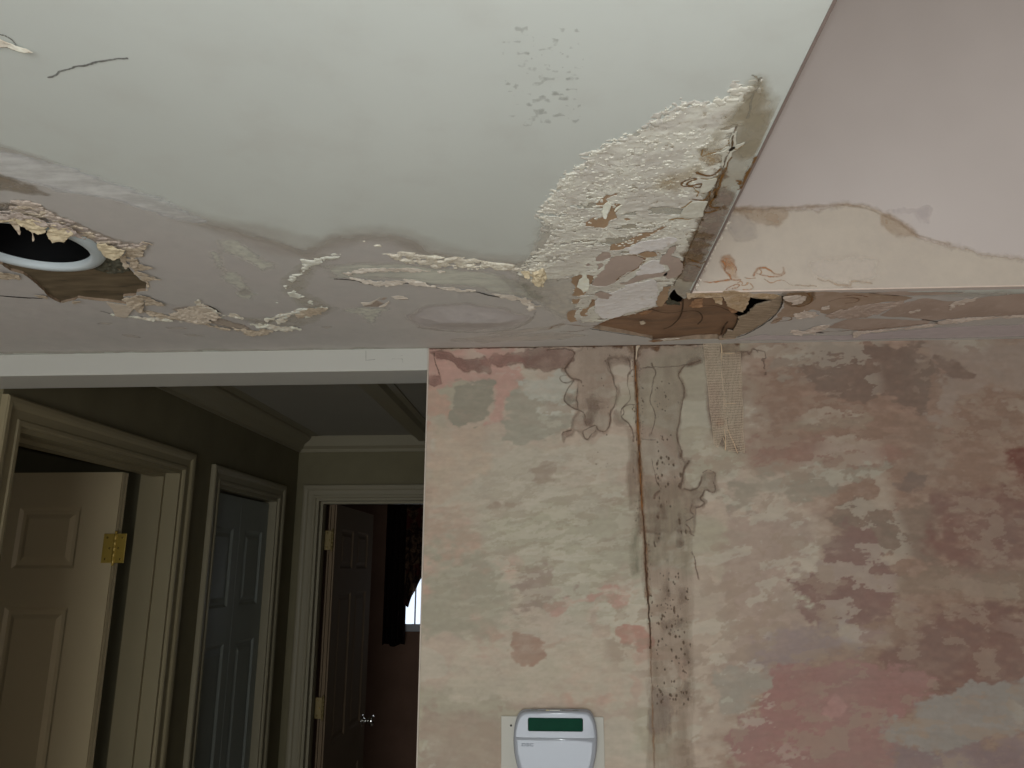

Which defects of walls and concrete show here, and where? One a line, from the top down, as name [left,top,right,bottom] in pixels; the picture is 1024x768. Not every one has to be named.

peeling [0,34,33,53]
peeling [0,200,328,337]
leakage [0,79,1024,452]
peeling [586,193,630,228]
peeling [567,225,684,322]
peeling [735,291,1024,340]
crack [430,75,762,750]
leakage [652,425,715,535]
leakage [648,573,691,705]